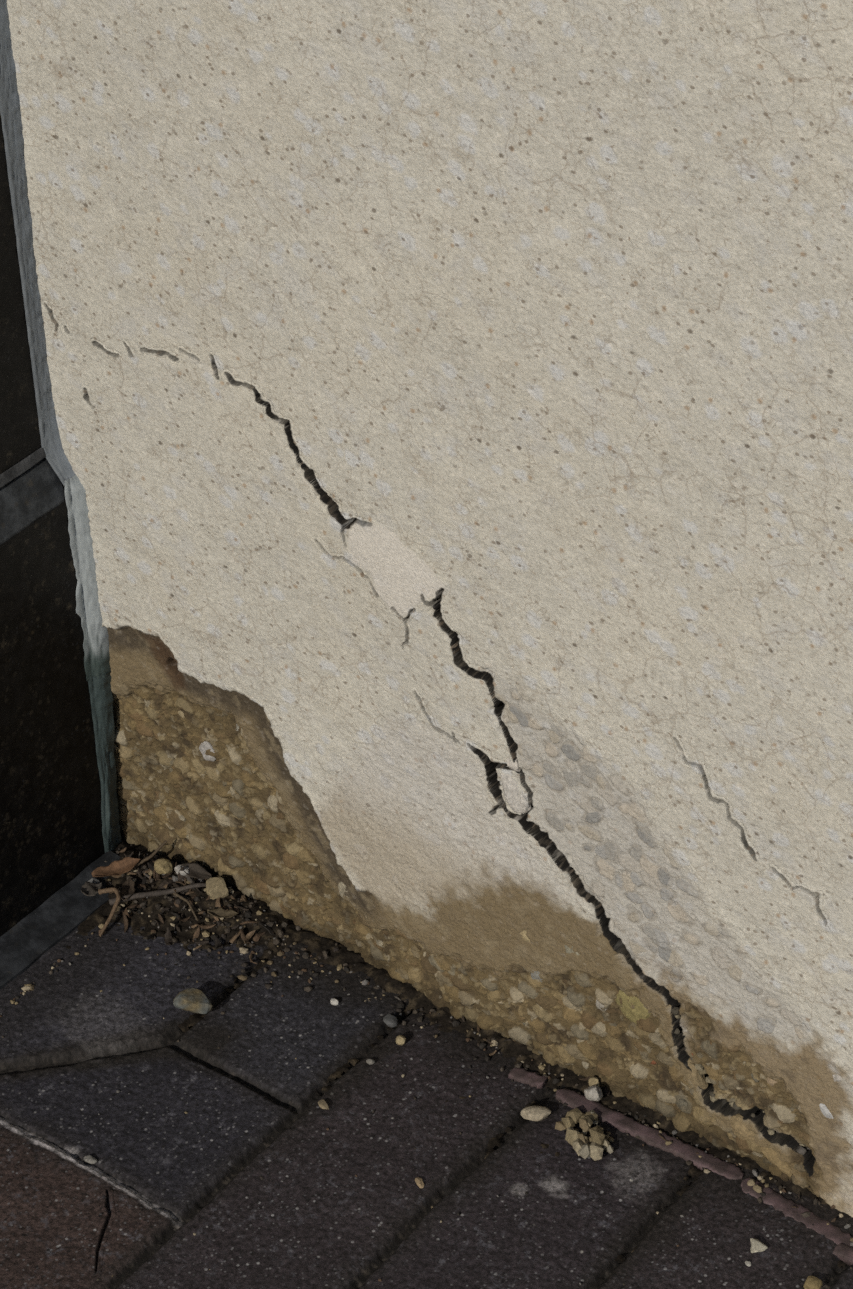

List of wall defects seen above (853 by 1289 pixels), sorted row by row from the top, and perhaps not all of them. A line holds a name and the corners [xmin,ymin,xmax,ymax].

crack [42,300,830,1181]
spalling [112,652,823,1199]
leakage [102,620,853,1217]
spalling [819,1103,834,1119]